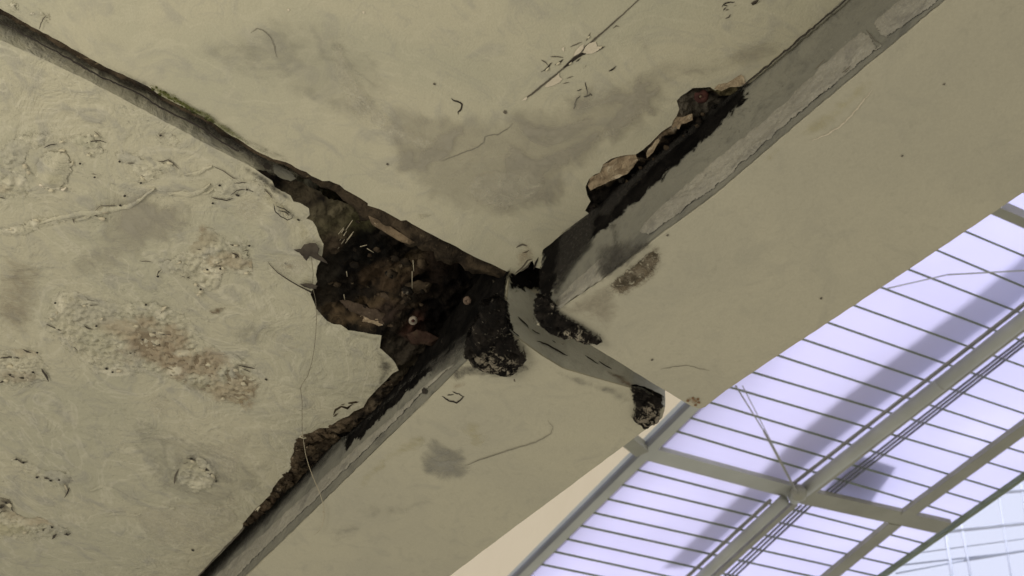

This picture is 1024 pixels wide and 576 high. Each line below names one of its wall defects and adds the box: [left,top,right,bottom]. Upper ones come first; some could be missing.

spalling [585,75,749,213]
peeling [0,349,50,388]
peeling [45,291,267,404]
peeling [142,227,253,296]
spalling [209,167,481,527]
water stain [200,0,943,576]
peeling [555,257,616,308]
peeling [216,364,453,576]